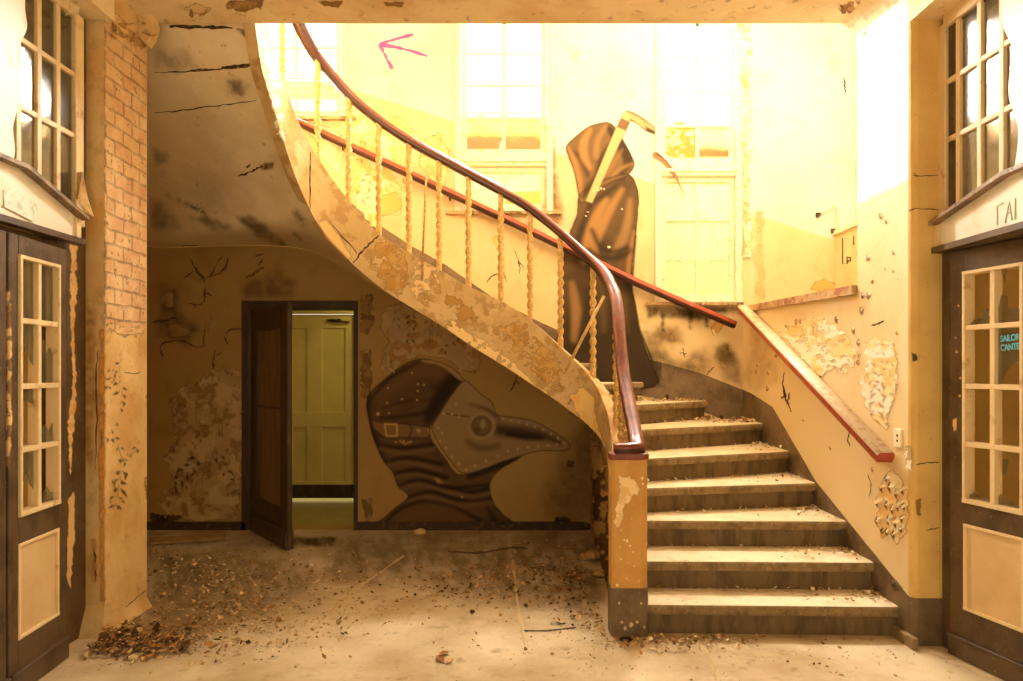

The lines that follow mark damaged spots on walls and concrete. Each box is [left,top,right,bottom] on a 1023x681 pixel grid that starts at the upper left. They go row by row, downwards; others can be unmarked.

crack [154,63,250,73]
crack [156,100,256,113]
crack [238,164,263,177]
peeling [319,220,351,260]
crack [152,245,264,369]
peeling [66,492,75,589]
peeling [67,244,78,475]
peeling [144,366,244,528]
peeling [370,238,644,587]
crack [781,372,792,412]
peeling [779,316,899,429]
peeling [874,446,921,544]